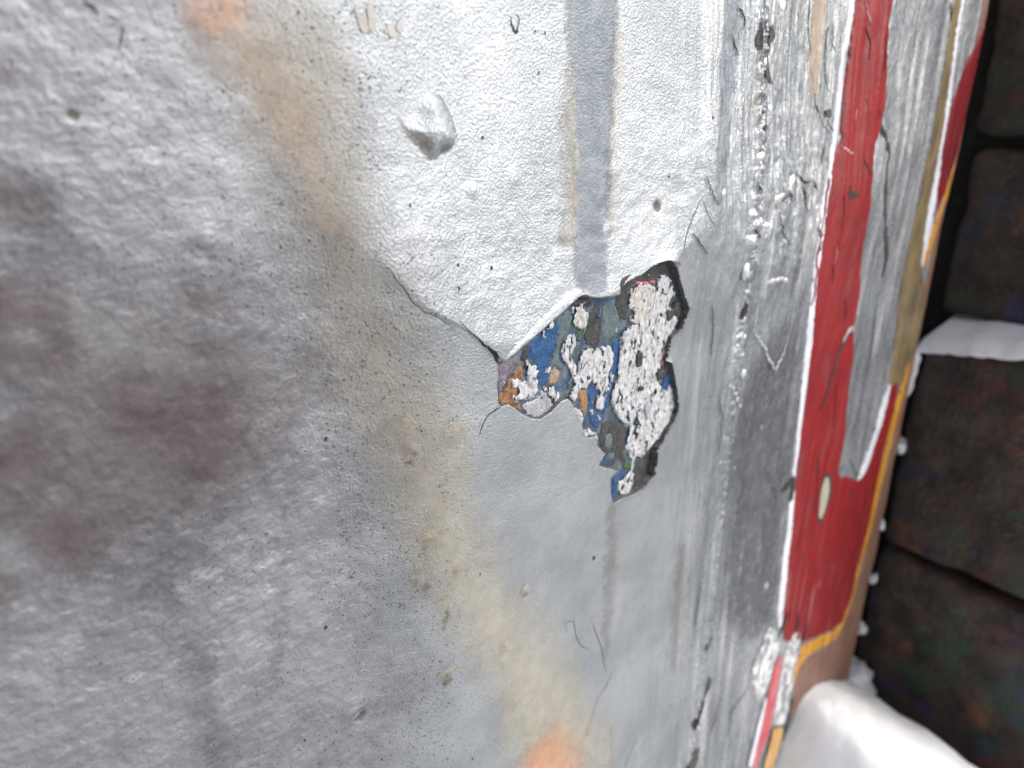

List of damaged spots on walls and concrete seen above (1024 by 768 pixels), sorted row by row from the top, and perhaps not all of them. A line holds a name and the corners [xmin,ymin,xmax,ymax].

leakage [567,0,617,293]
crack [375,250,499,364]
peeling [497,260,688,500]